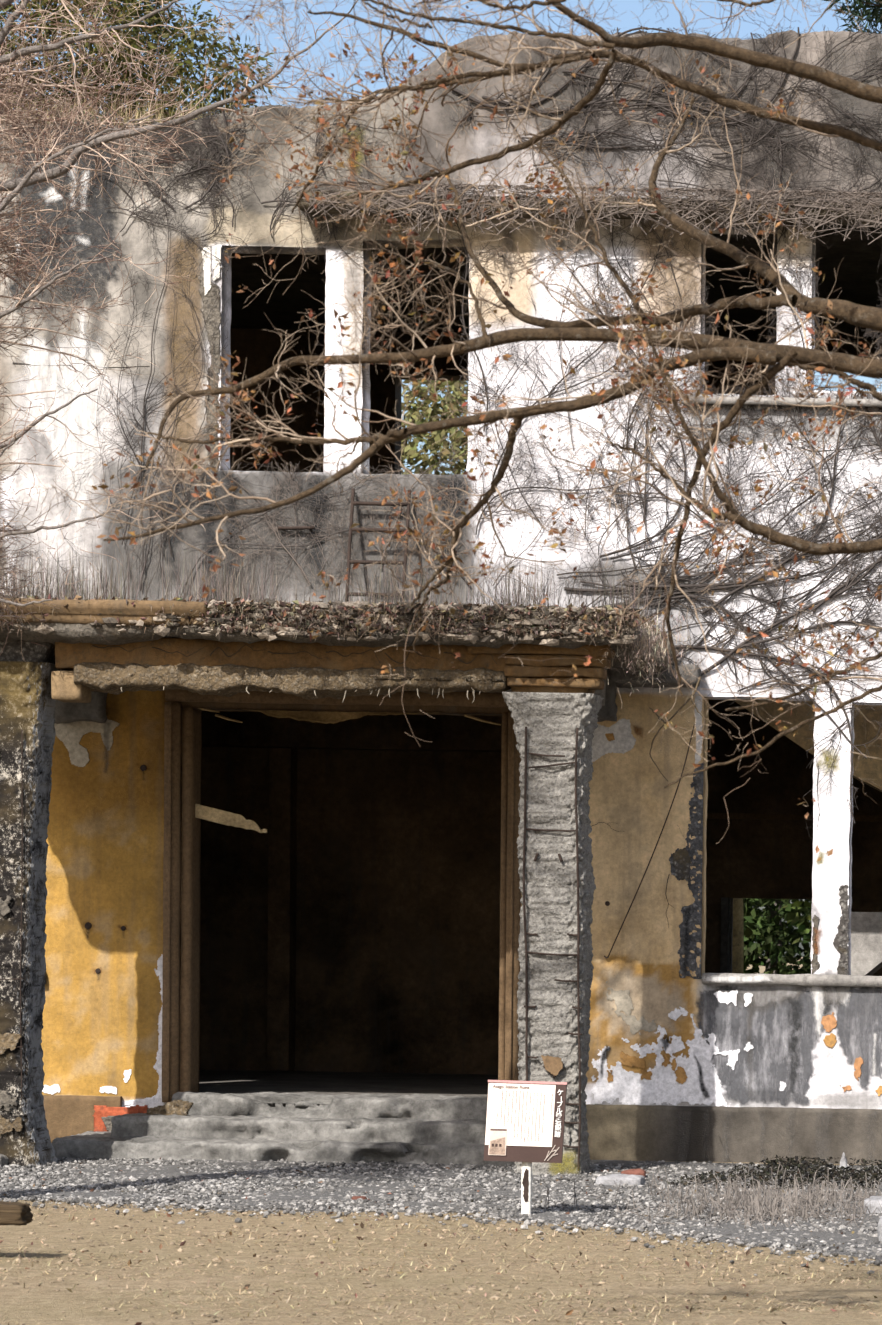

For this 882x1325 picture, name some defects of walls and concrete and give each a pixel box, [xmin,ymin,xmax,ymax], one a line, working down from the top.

water stain [527,58,596,166]
water stain [664,43,760,131]
water stain [825,48,882,170]
water stain [5,111,119,541]
spalling [0,661,731,1176]
spalling [811,884,850,1048]
peeling [842,1057,863,1092]